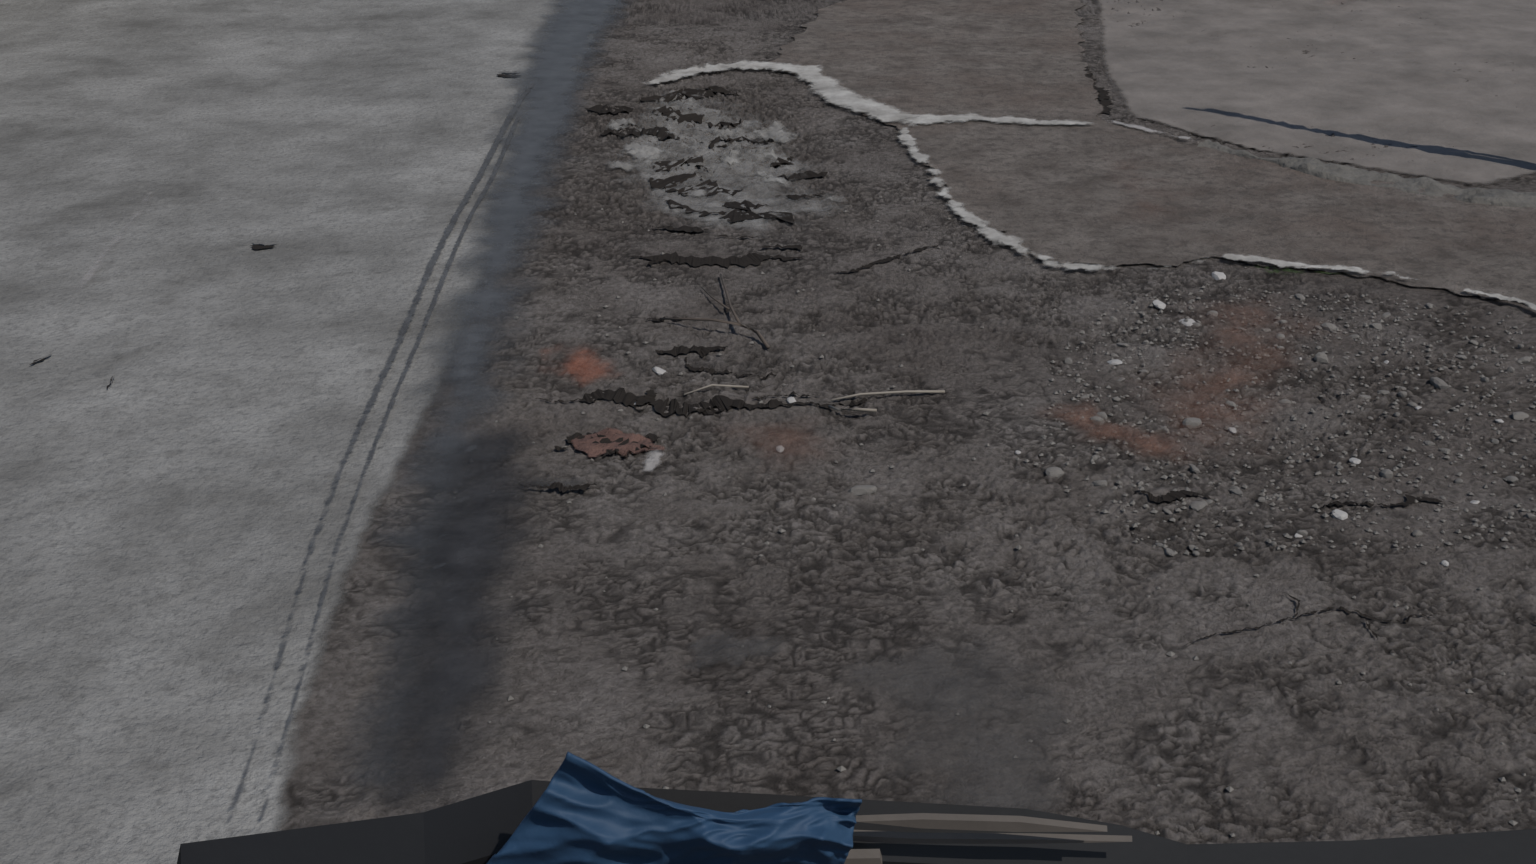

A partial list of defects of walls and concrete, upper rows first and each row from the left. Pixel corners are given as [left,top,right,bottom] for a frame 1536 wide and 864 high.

crack [1085,66,1125,126]
spalling [585,85,839,250]
water stain [647,60,1114,270]
crack [631,243,943,273]
water stain [1223,253,1409,279]
water stain [1463,288,1536,310]
crack [536,317,867,417]